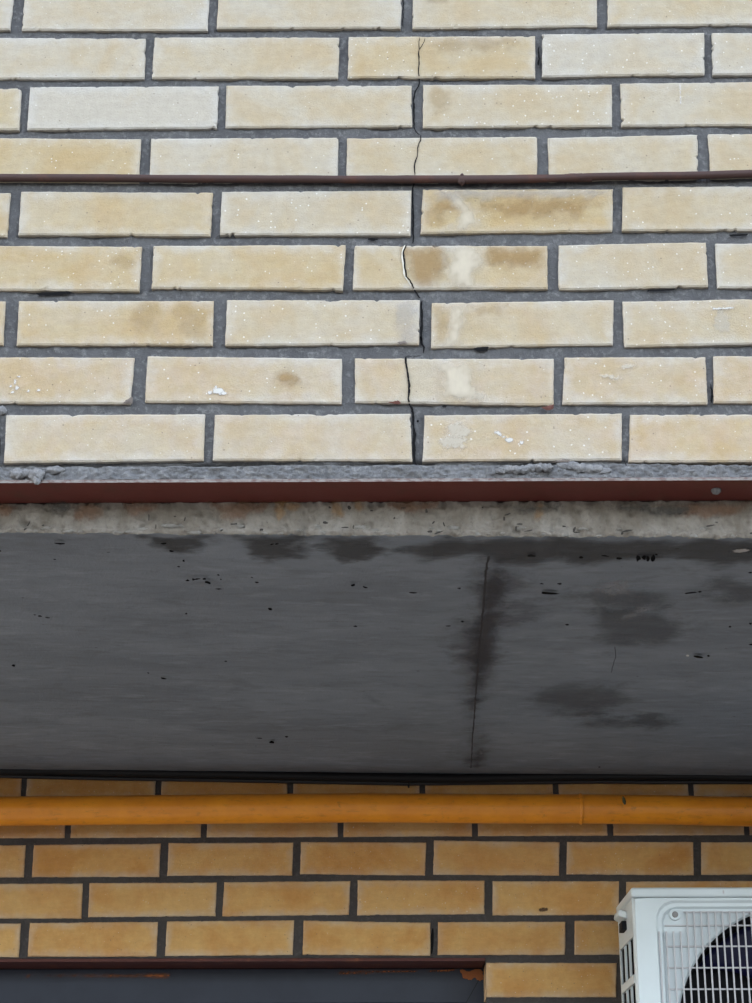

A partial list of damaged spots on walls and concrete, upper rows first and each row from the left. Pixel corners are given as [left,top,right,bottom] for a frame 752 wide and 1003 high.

crack [401,0,425,465]
damp [142,537,201,552]
damp [246,536,303,559]
damp [329,539,382,561]
damp [405,538,752,564]
crack [468,556,500,768]